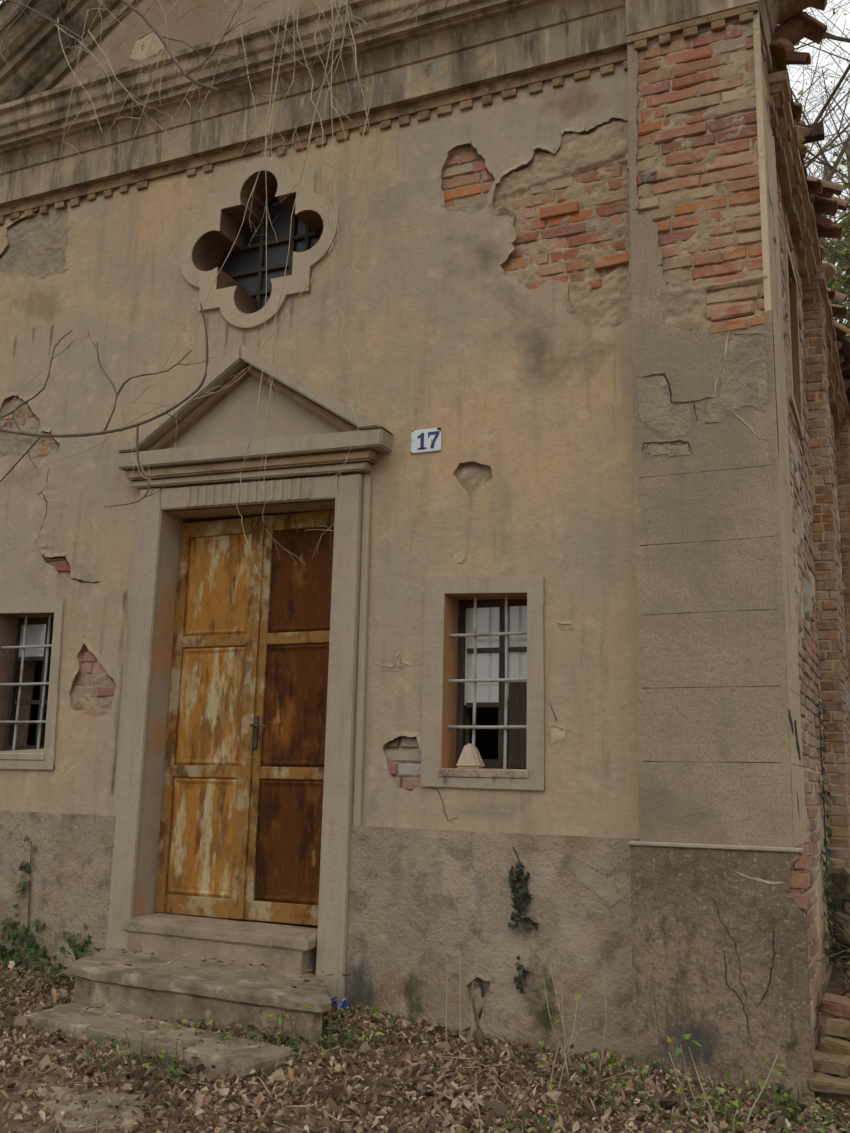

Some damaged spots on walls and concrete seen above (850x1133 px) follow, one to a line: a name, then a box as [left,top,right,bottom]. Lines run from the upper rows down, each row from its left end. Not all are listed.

flaking render [0,204,73,279]
flaking render [437,18,771,459]
crack [642,315,779,455]
flaking render [0,391,60,457]
flaking render [455,462,493,497]
flaking render [66,638,116,717]
flaking render [384,730,422,791]
crack [732,870,784,884]
crack [711,898,776,1048]
damp [677,1024,711,1067]